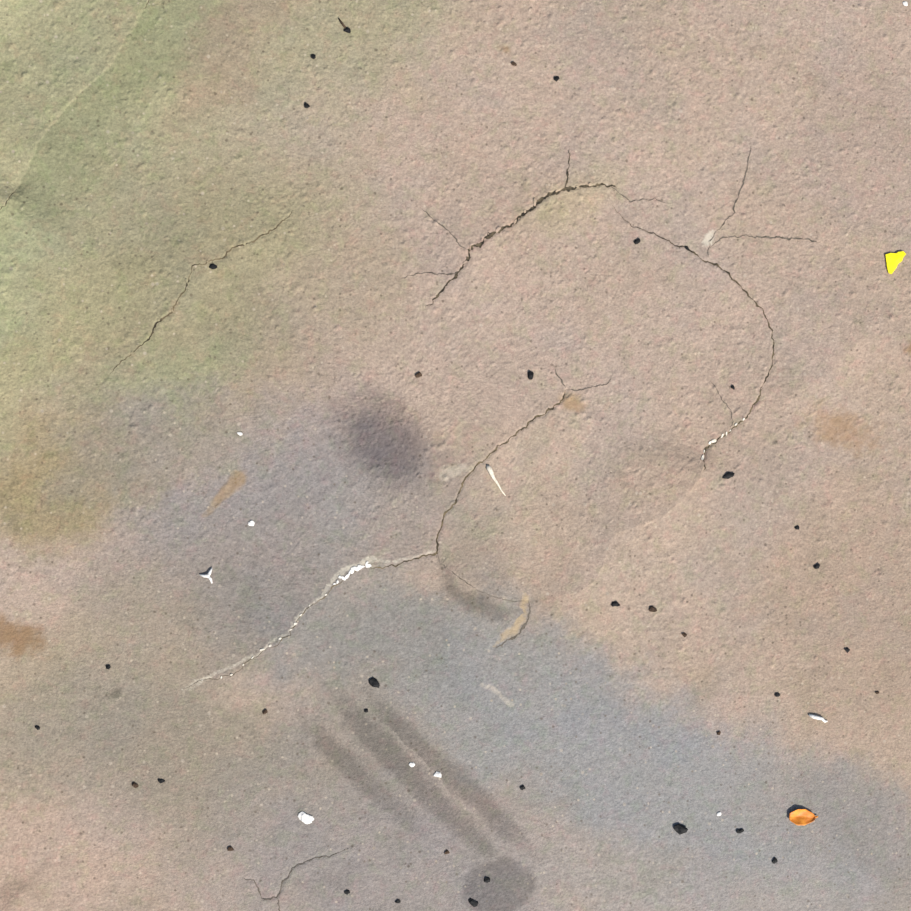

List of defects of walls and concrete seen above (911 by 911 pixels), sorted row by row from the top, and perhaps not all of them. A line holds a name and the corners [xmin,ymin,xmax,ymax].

crack [109,210,295,375]
crack [402,142,817,470]
damp [294,359,476,521]
crack [189,366,611,687]
rust [0,603,67,669]
damp [178,548,436,697]
damp [291,668,552,911]